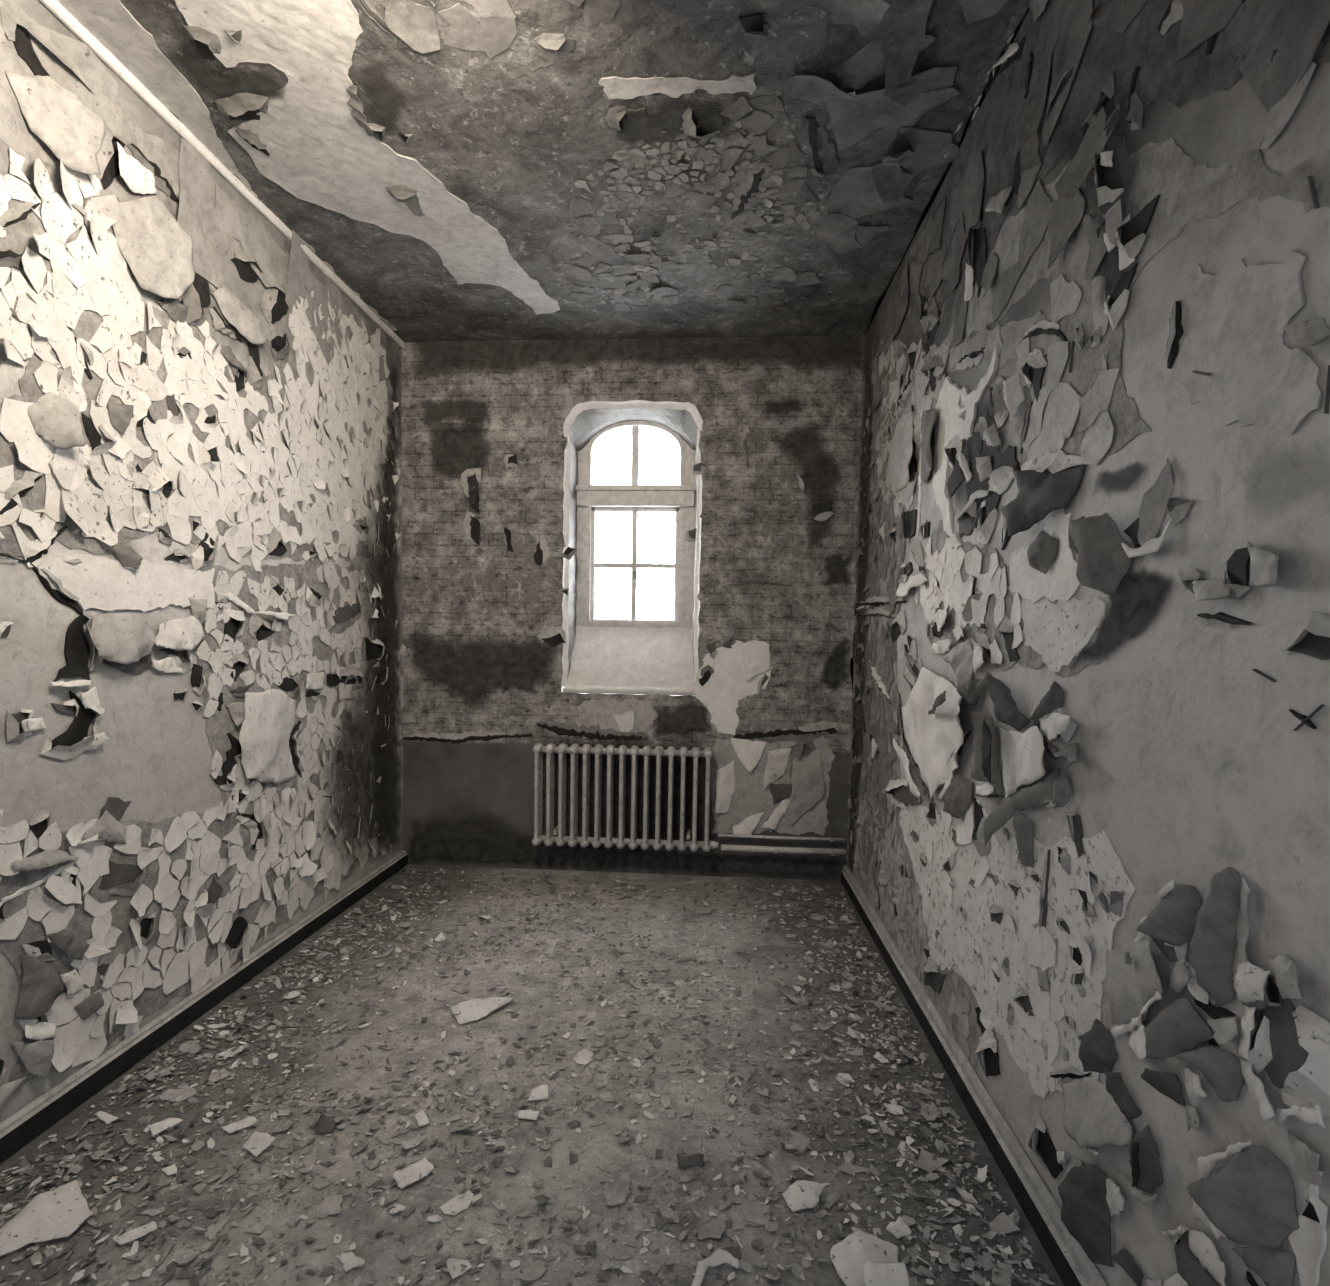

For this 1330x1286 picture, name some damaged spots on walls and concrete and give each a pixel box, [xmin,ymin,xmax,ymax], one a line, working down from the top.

peeling [170,0,669,314]
peeling [0,0,578,1108]
water stain [825,556,850,585]
water stain [330,369,840,879]
peeling [541,0,1330,1205]
water stain [822,638,847,690]
peeling [518,1109,539,1120]
peeling [140,1206,165,1217]
peeling [989,1212,1020,1235]
peeling [1028,1113,1328,1286]
peeling [863,1261,910,1286]